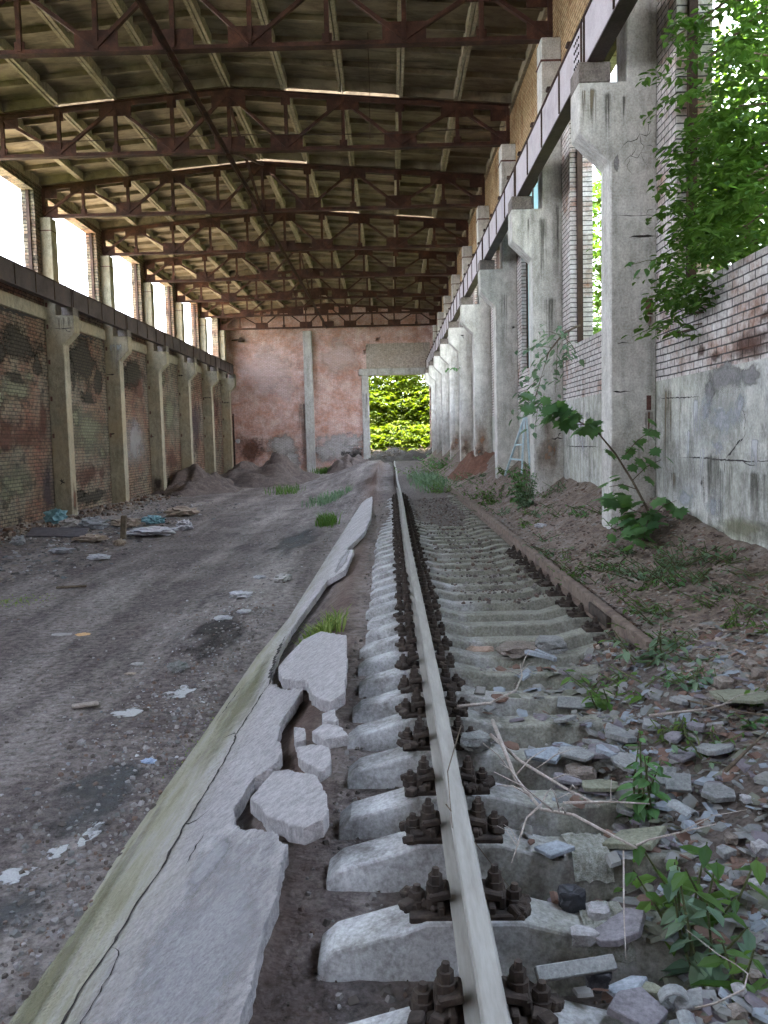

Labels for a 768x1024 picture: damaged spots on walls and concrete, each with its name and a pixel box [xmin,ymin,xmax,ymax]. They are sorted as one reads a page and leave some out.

damp [582,89,610,117]
crack [622,122,653,168]
damp [192,405,200,452]
crack [682,396,765,471]
crack [61,637,285,1024]